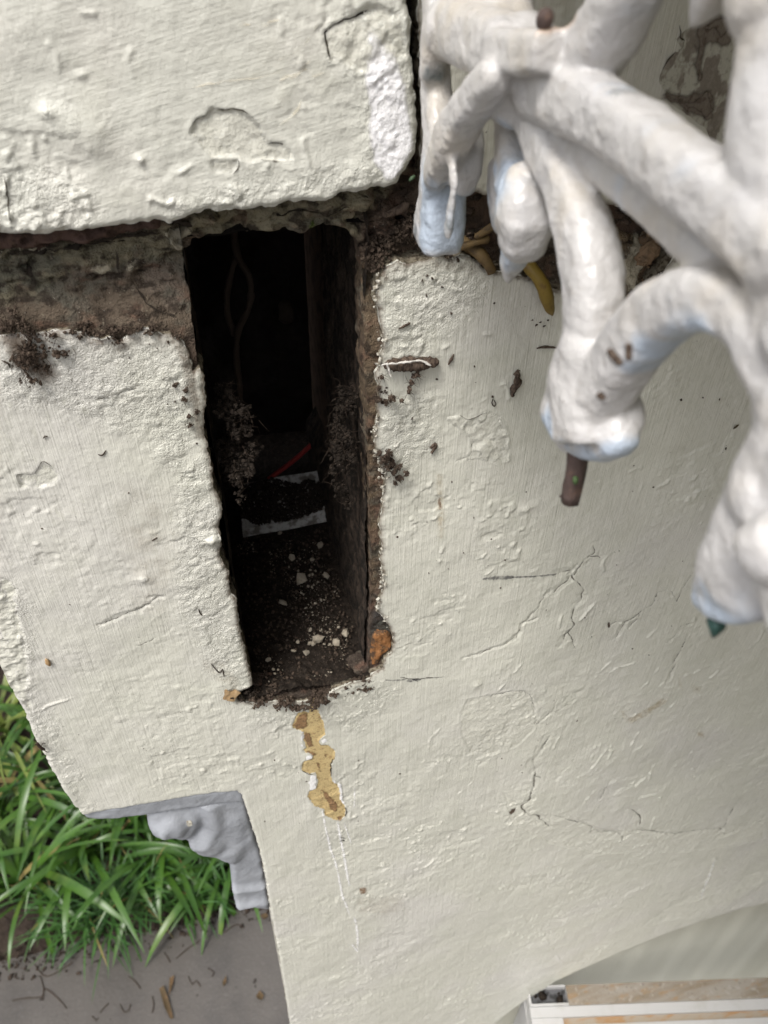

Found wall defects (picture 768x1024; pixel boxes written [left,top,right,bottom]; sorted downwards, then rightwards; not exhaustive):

peeling [659,13,736,144]
spalling [464,193,501,262]
spalling [535,235,561,286]
spalling [607,204,647,295]
spalling [0,0,419,821]
crack [468,547,600,657]